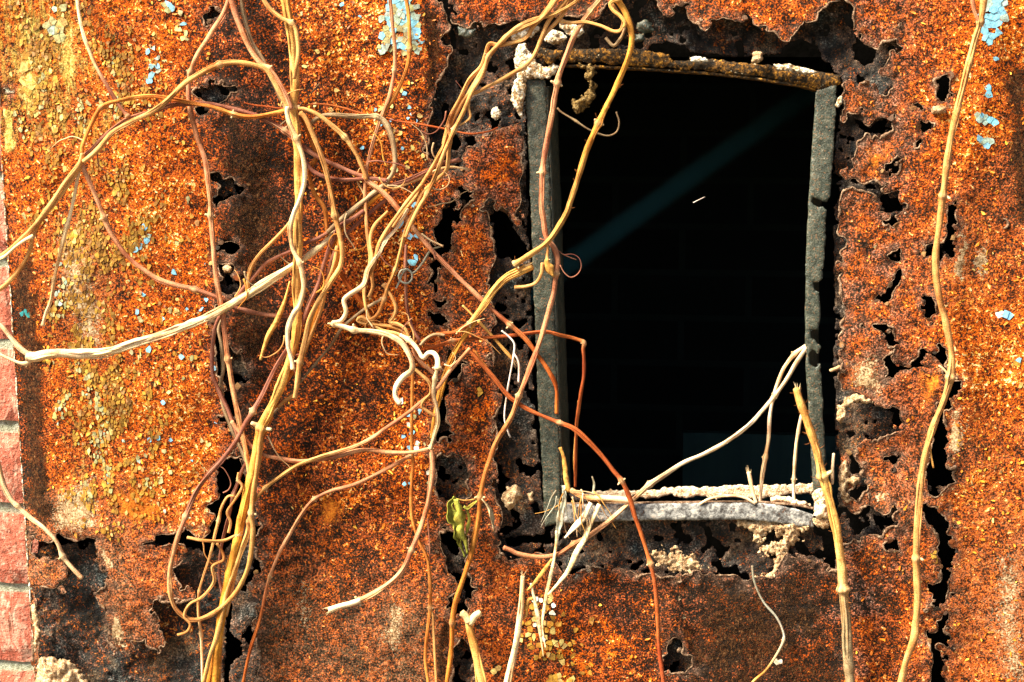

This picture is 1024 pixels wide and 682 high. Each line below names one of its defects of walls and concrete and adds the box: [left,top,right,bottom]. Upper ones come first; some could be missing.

peeling [275,0,436,113]
corrosion [423,10,443,94]
peeling [955,0,1009,61]
peeling [951,67,1014,194]
corrosion [210,114,287,359]
peeling [335,232,418,315]
corrosion [13,249,98,532]
peeling [288,357,430,529]
corrosion [945,408,965,454]
peeling [953,407,1024,561]
corrosion [436,623,462,680]
corrosion [996,559,1023,681]